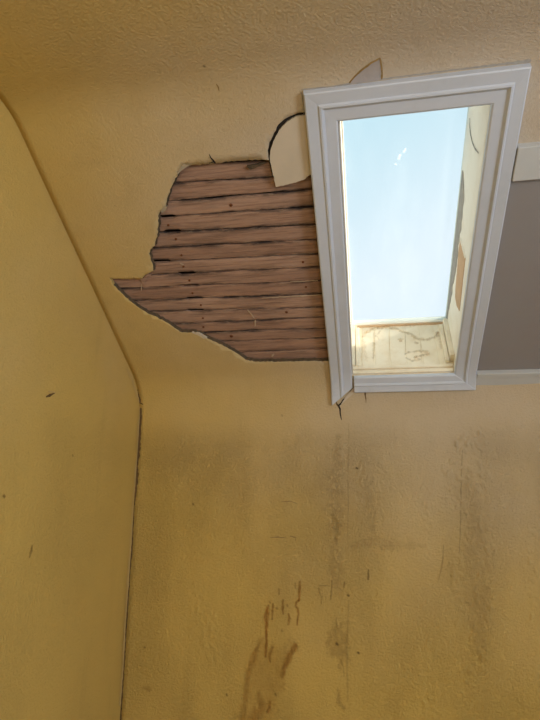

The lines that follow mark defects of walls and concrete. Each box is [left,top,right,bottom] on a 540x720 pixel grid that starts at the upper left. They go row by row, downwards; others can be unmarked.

crack [268,59,531,177]
flaking render [140,164,189,285]
flaking render [114,283,329,362]
crack [336,387,366,420]